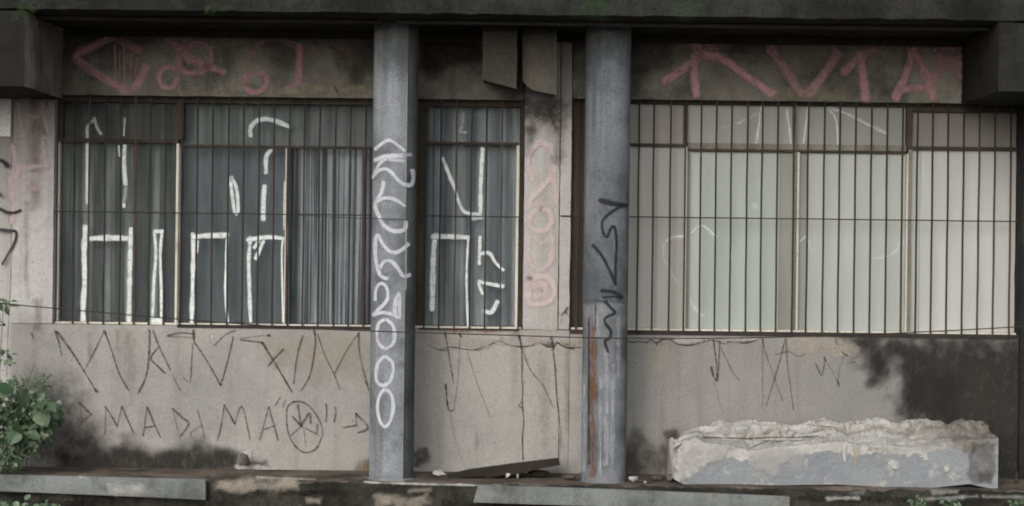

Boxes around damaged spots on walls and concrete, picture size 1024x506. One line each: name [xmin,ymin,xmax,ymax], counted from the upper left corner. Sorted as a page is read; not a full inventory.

damp [41,405,237,469]
crack [428,341,581,460]
peeling [678,446,730,478]
damp [856,337,1019,479]